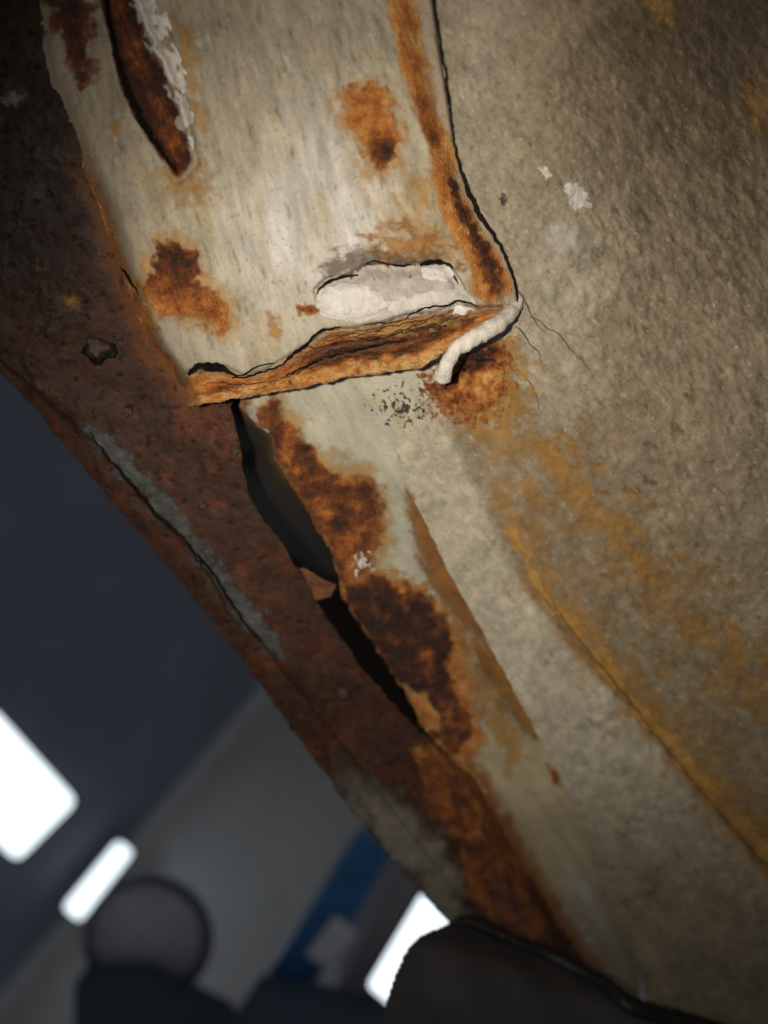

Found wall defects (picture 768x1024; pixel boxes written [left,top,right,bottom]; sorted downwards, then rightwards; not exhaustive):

corrosion [41,0,99,91]
spalling [99,0,205,205]
corrosion [82,0,537,794]
spalling [313,248,477,323]
crack [432,0,584,407]
crack [90,432,276,661]